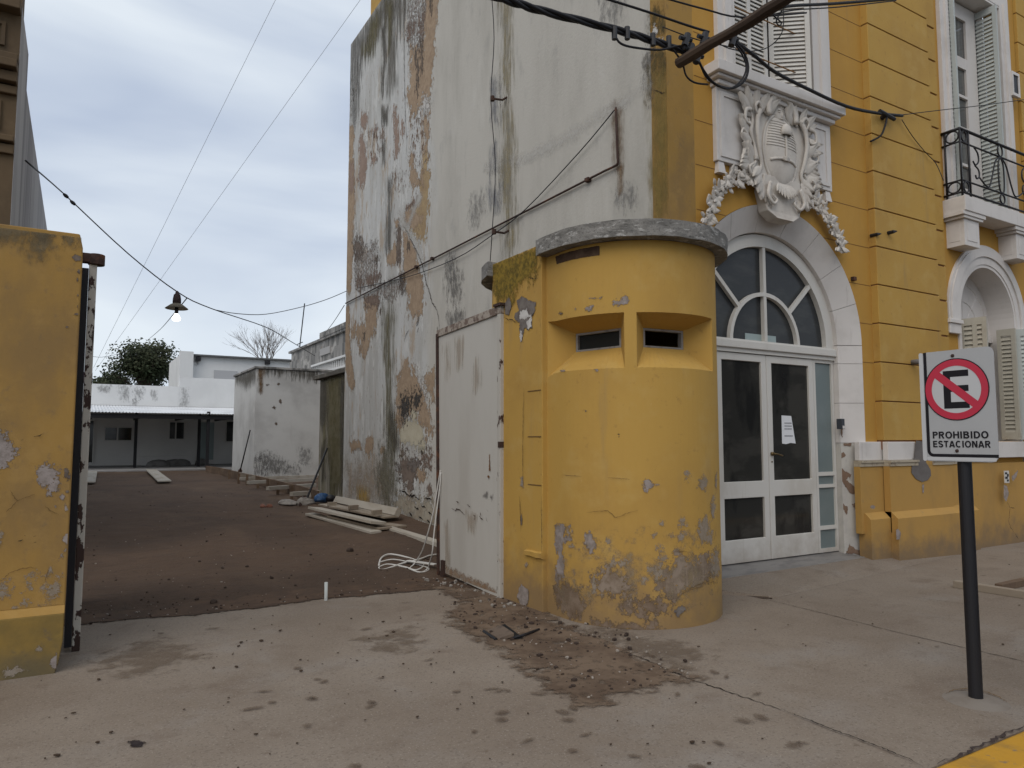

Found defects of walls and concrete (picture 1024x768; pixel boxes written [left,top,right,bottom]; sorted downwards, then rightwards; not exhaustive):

leakage [350,0,406,129]
peeling [345,0,439,392]
leakage [643,48,668,217]
flaking render [505,296,536,342]
flaking render [0,429,20,469]
flaking render [35,461,71,511]
leakage [236,369,425,506]
peeling [349,357,436,498]
peeling [553,470,720,630]
peeling [841,429,855,515]